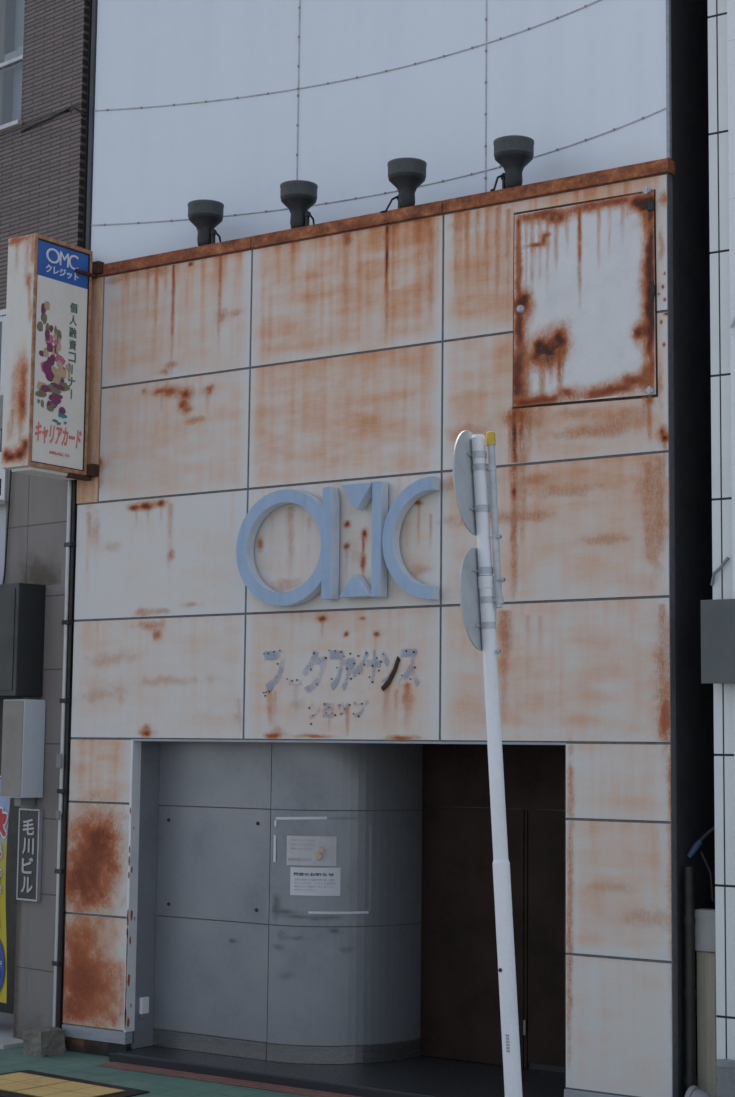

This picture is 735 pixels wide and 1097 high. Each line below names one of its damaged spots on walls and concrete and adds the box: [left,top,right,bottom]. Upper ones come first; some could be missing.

corrosion [151,265,175,335]
corrosion [12,358,28,421]
corrosion [143,387,194,422]
corrosion [496,190,669,563]
corrosion [2,439,28,463]
corrosion [129,499,165,511]
corrosion [659,682,670,741]
corrosion [63,810,122,1029]